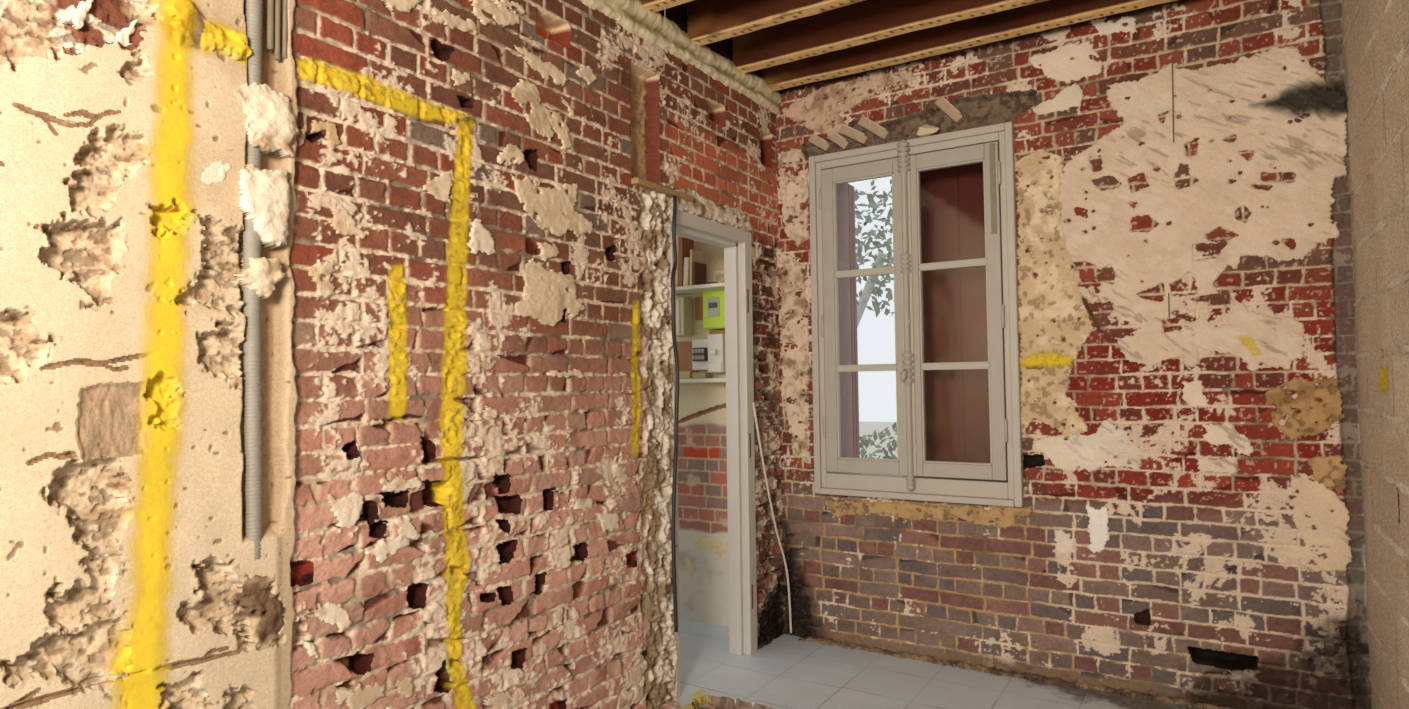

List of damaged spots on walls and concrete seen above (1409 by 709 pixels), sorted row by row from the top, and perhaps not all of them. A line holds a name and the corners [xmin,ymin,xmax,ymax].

flaking render [381,0,571,109]
flaking render [782,71,916,136]
flaking render [34,123,155,312]
flaking render [468,219,497,255]
flaking render [497,45,598,327]
flaking render [759,129,812,464]
flaking render [1015,16,1348,474]
flaking render [328,436,443,563]
spalling [492,473,523,565]
flaking render [1054,505,1110,554]
flaking render [1281,455,1353,572]
spalling [406,583,429,610]